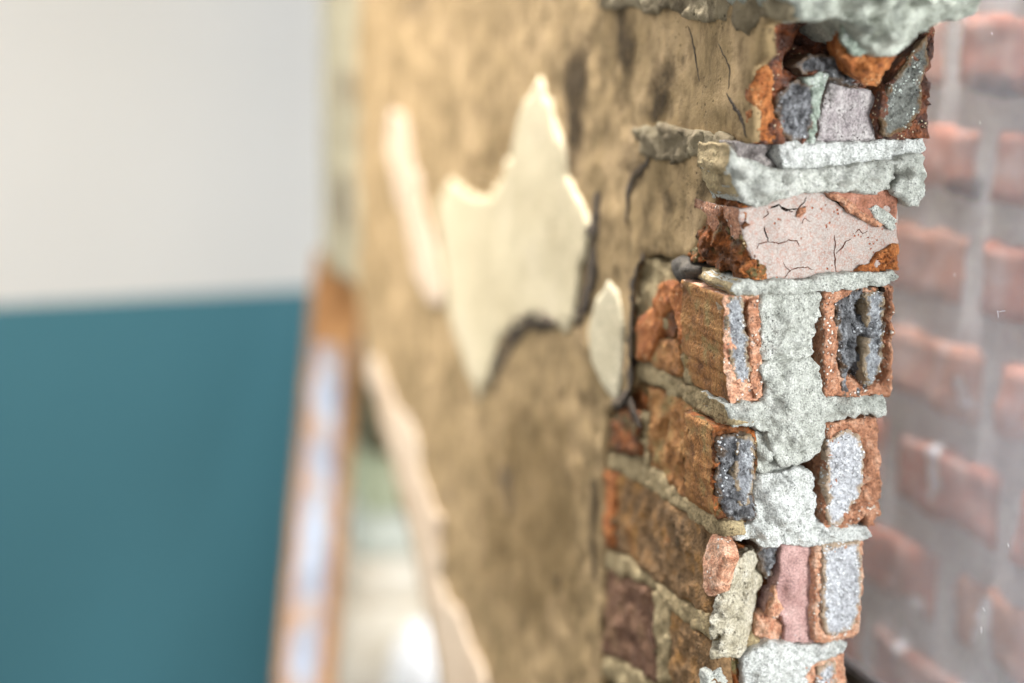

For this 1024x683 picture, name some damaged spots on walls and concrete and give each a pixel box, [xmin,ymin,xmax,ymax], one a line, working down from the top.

crack [687,26,747,137]
spalling [745,22,935,145]
flaking render [386,77,591,402]
spalling [688,194,767,280]
crack [757,194,867,278]
spalling [850,243,900,272]
spalling [588,279,763,457]
spalling [811,284,895,398]
spalling [602,468,620,548]
spalling [682,409,758,523]
spalling [799,414,882,528]
spalling [699,534,864,683]